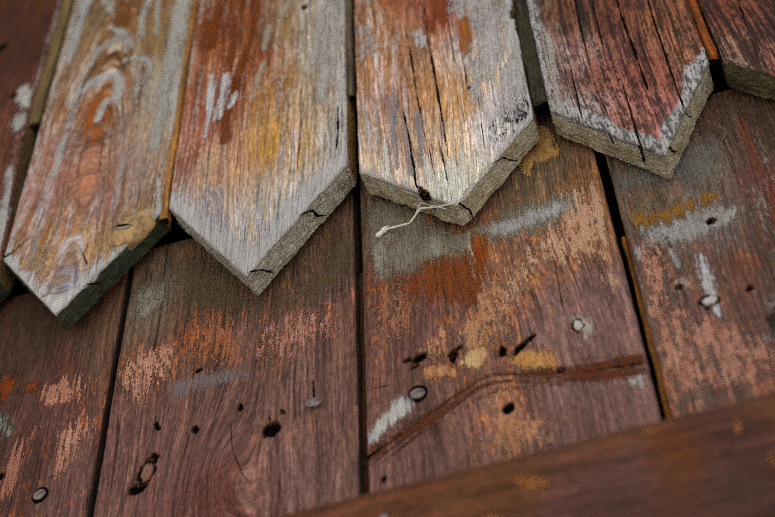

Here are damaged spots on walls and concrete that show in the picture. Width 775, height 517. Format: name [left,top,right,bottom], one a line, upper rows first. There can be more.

crack [570,0,603,126]
crack [616,0,648,90]
peeling [79,90,113,144]
crack [403,4,473,218]
peeling [518,125,560,176]
crack [622,84,645,165]
peeling [371,175,620,382]
peeling [640,240,774,391]
peeling [0,426,42,505]
peeling [37,373,89,409]
peeling [51,415,96,480]
crack [366,385,459,460]